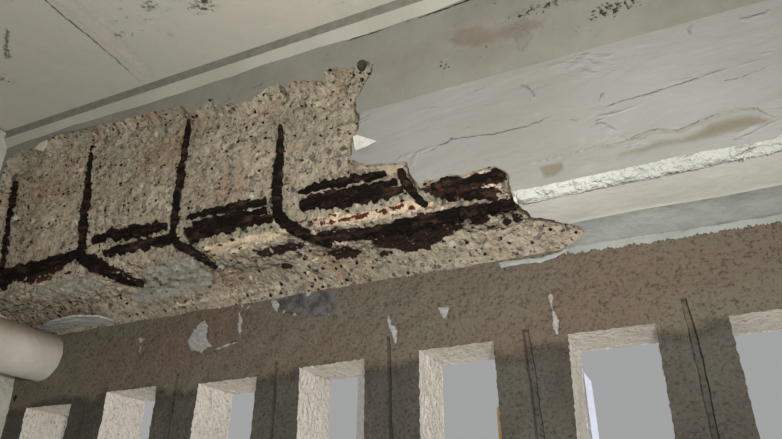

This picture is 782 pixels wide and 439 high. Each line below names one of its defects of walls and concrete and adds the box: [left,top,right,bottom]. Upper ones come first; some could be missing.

crack [45,0,128,70]
spalling [0,60,585,335]
corrosion [418,177,504,201]
corrosion [0,180,147,292]
corrosion [252,242,314,270]
corrosion [299,204,524,264]